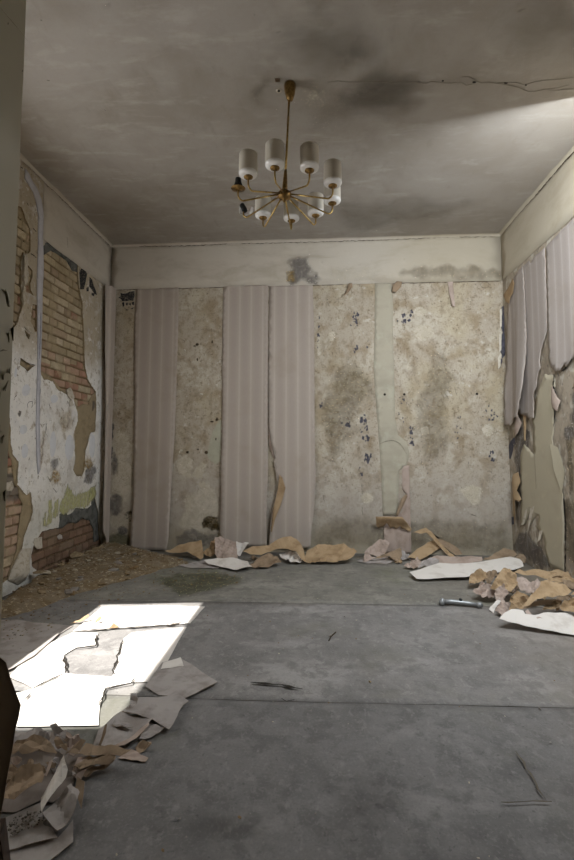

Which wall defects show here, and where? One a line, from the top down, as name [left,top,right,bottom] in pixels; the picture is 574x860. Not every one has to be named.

crack [332,76,574,92]
crack [478,152,574,237]
spalling [0,207,97,476]
peeling [119,291,135,310]
damp [288,259,317,283]
peeling [341,414,370,442]
spalling [0,411,100,608]
spalling [175,449,220,541]
peeling [509,374,574,571]